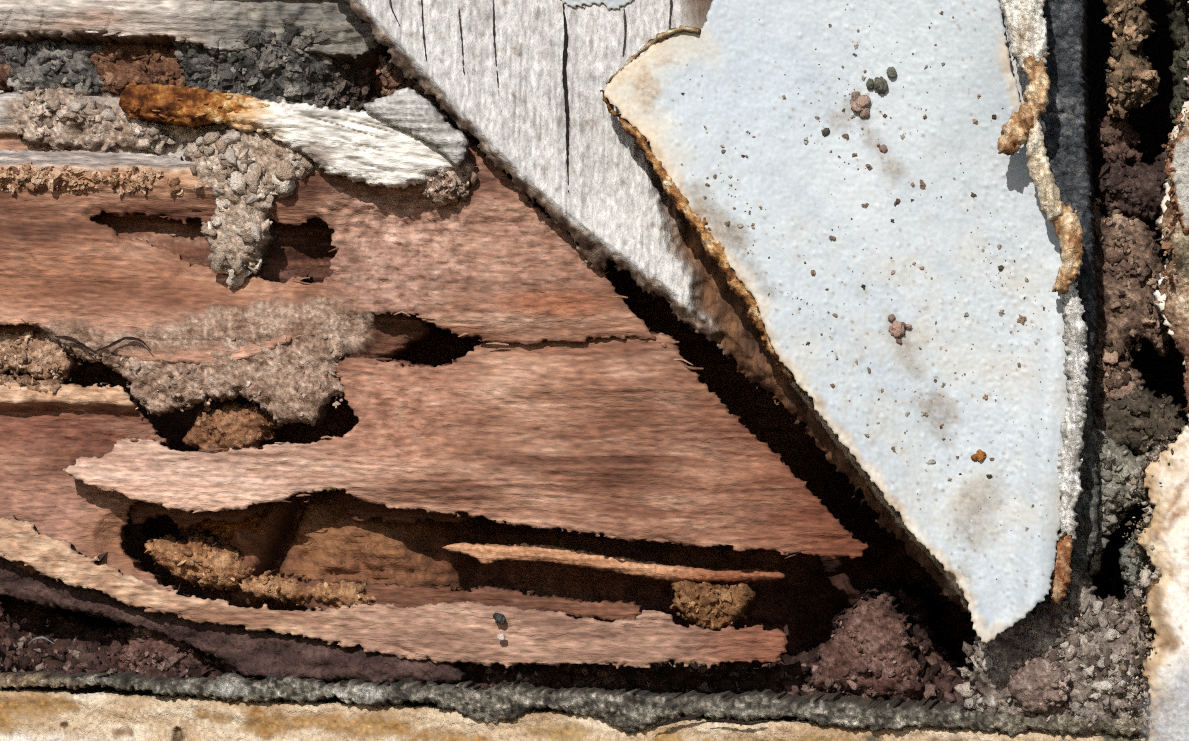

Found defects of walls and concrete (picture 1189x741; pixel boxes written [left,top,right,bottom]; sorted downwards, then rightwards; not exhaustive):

peeling [363,87,470,167]
crack [561,4,569,192]
peeling [600,0,1091,644]
flaking render [1155,109,1189,414]